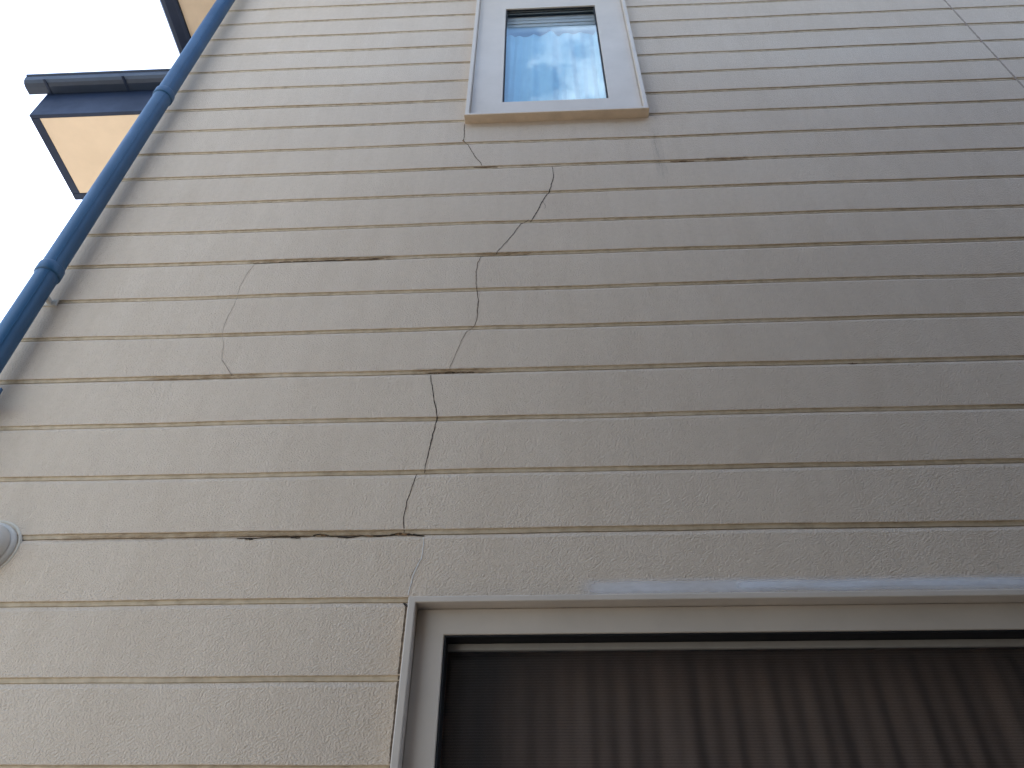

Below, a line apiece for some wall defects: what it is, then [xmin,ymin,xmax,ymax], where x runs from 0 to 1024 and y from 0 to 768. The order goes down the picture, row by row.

crack [221,265,254,376]
crack [403,167,554,595]